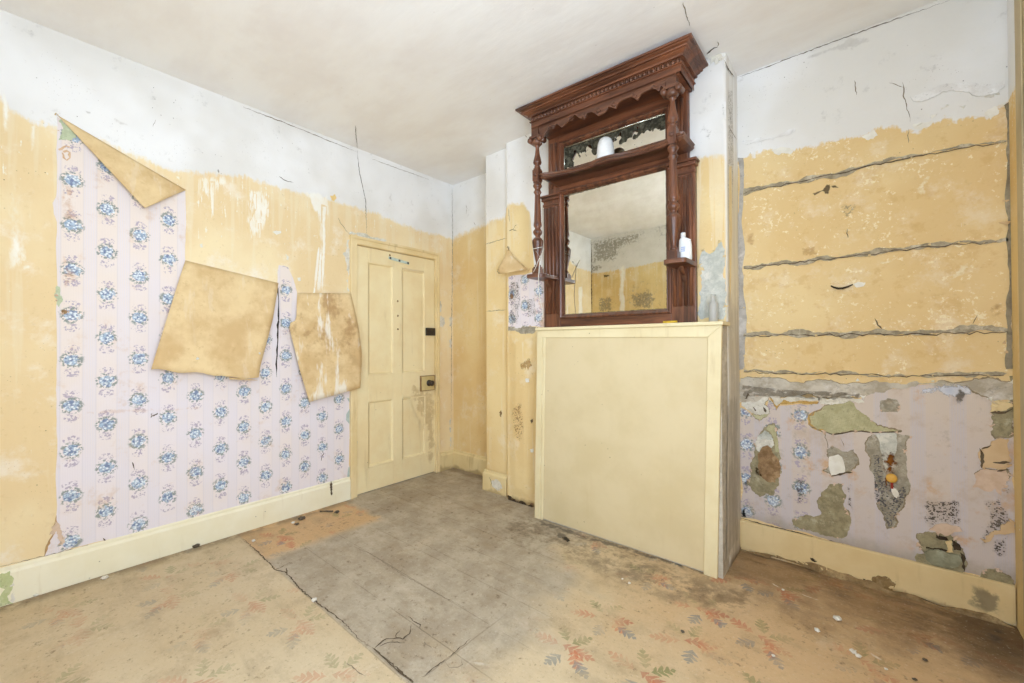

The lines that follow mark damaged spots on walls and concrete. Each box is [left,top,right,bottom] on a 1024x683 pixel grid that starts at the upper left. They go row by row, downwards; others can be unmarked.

crack [244,107,429,233]
flaking render [697,102,1014,497]
flaking render [823,430,912,529]
flaking render [915,523,968,573]